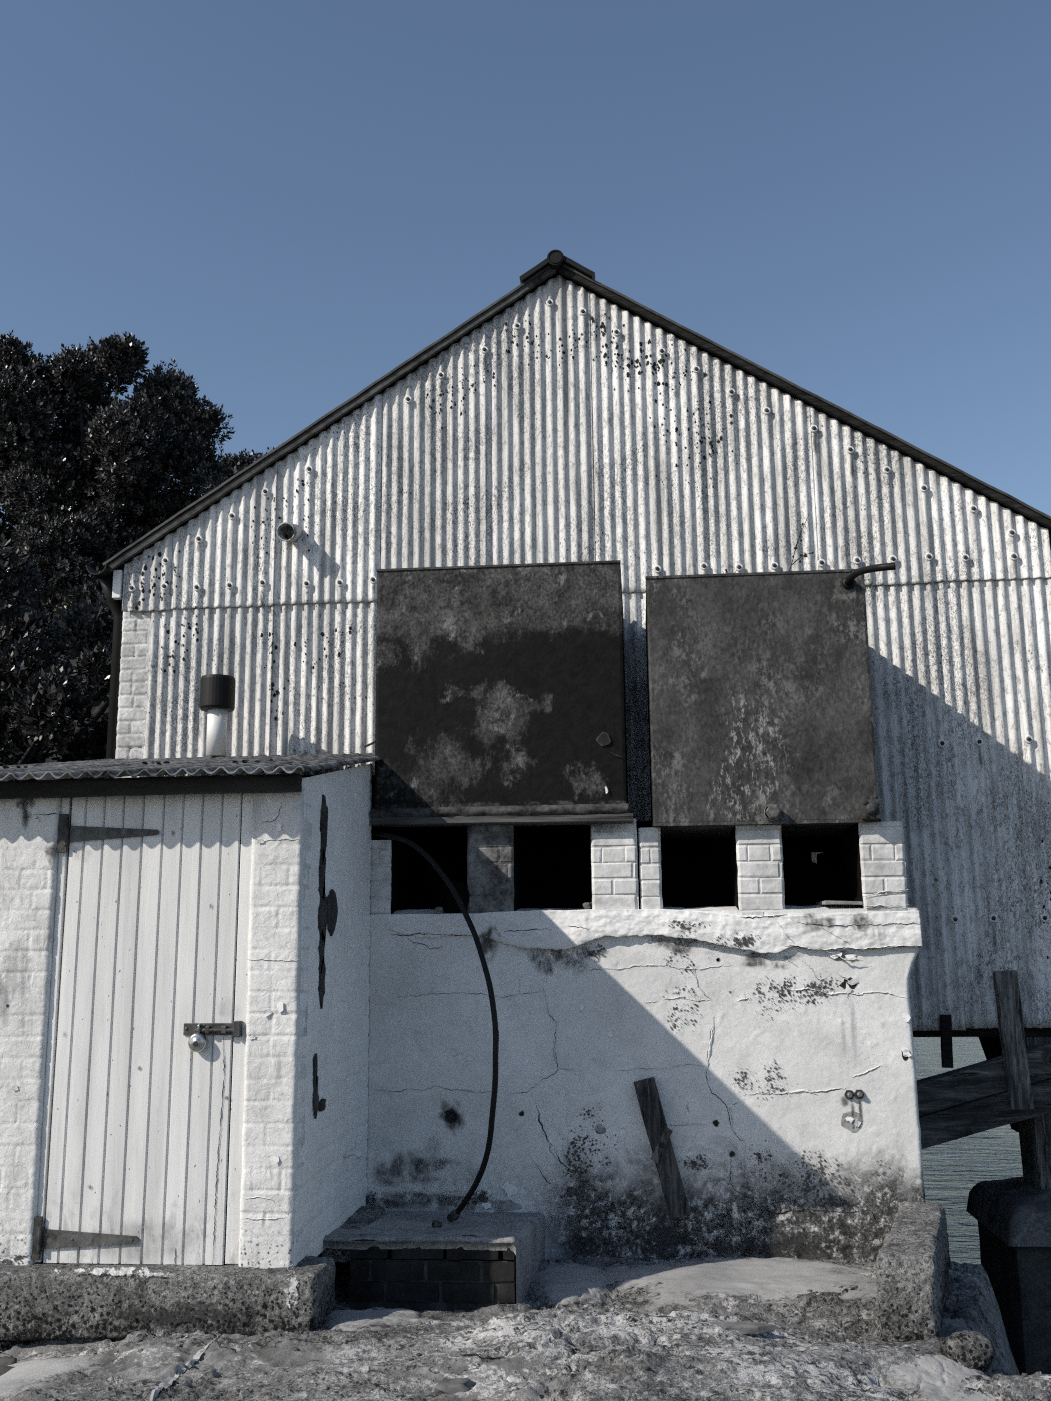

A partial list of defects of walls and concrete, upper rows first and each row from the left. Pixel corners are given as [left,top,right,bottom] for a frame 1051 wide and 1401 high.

crack [507,925,587,933]
crack [741,889,922,998]
spalling [829,950,857,961]
peeling [839,977,858,993]
crack [376,978,575,1185]
crack [591,964,882,1223]
leakage [464,1190,495,1204]